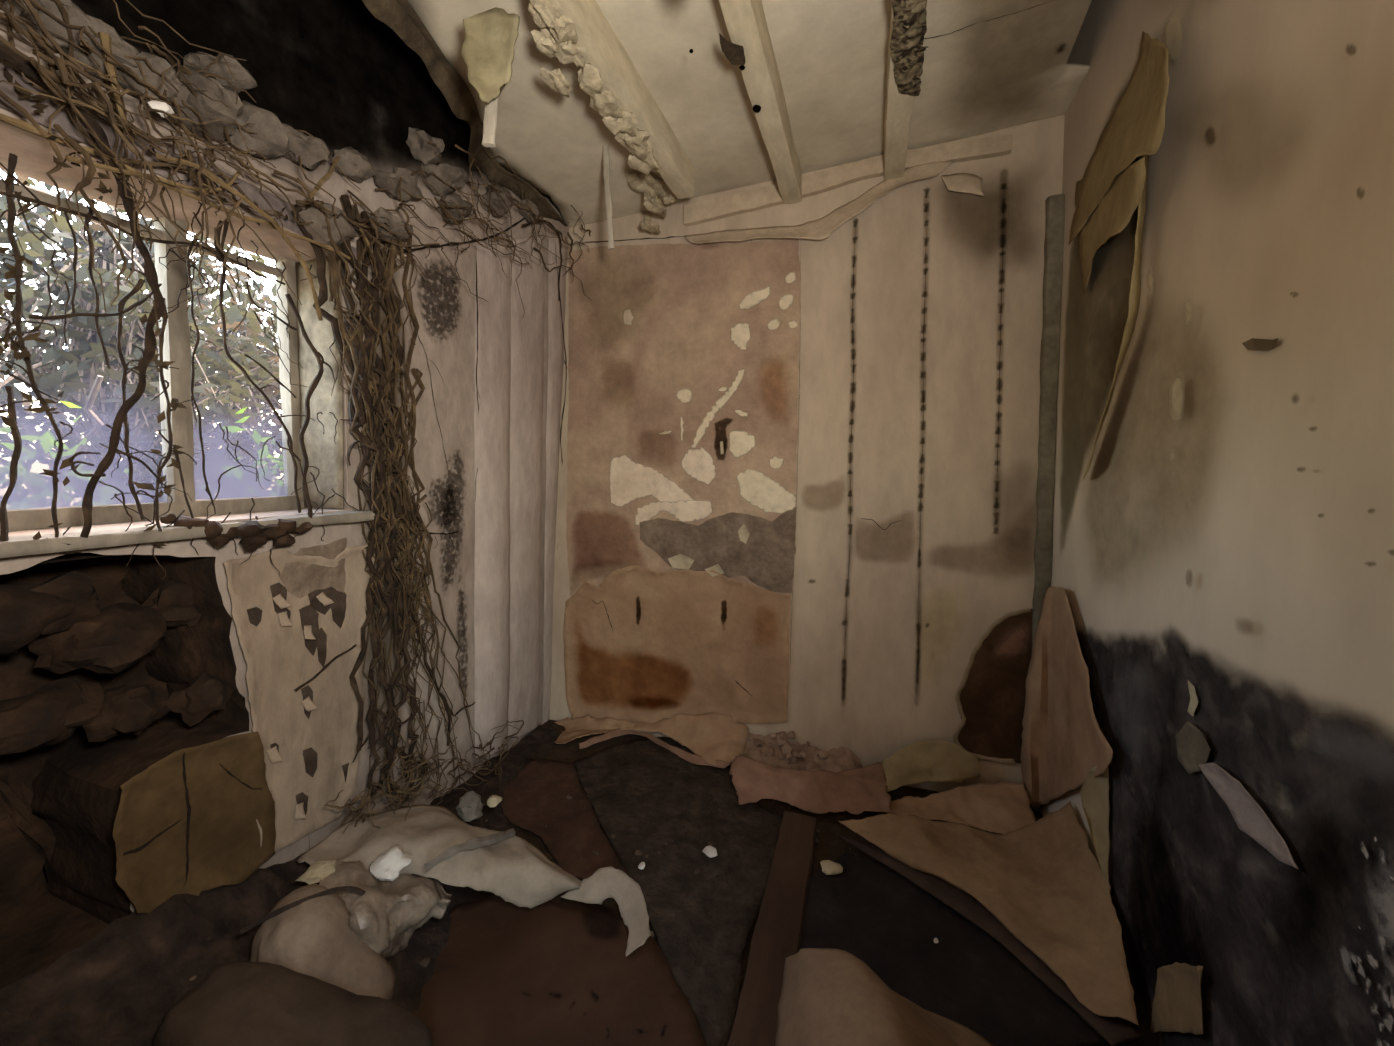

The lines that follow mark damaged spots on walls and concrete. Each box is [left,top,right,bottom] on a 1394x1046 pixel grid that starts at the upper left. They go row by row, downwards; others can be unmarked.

peeling [890,0,928,96]
spalling [0,538,375,990]
damp [422,266,458,339]
damp [433,452,467,688]
flaking render [461,0,801,597]
damp [843,222,856,638]
damp [919,187,927,518]
damp [1076,630,1394,1046]